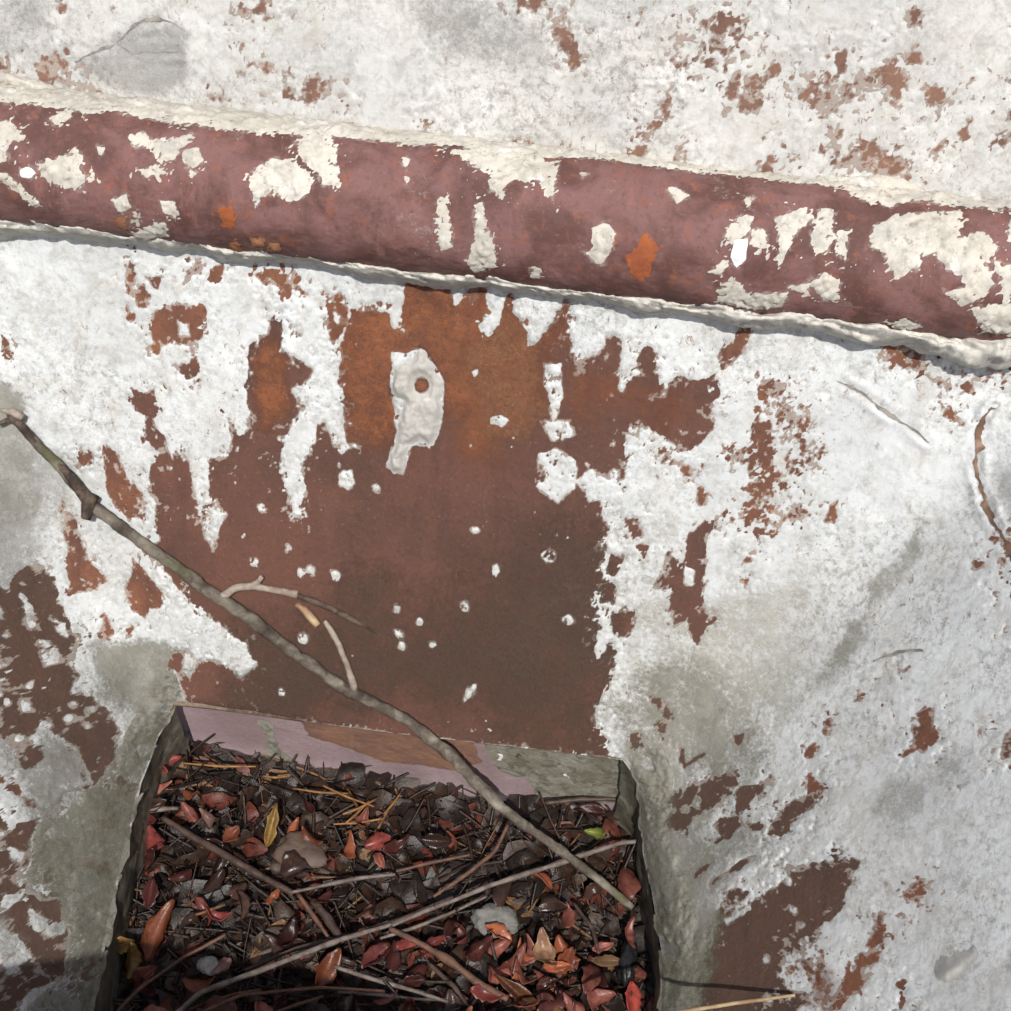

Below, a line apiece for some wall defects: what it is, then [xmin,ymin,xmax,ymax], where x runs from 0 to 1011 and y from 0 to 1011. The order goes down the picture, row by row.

corrosion [626,0,976,185]
peeling [530,266,545,278]
peeling [707,250,729,282]
peeling [883,318,922,330]
corrosion [876,345,1011,434]
water stain [0,383,66,586]
crack [973,407,1011,572]
water stain [87,638,180,724]
corrosion [0,200,845,1011]
corrosion [898,699,952,771]
water stain [0,739,108,935]
corrosion [671,842,947,1011]